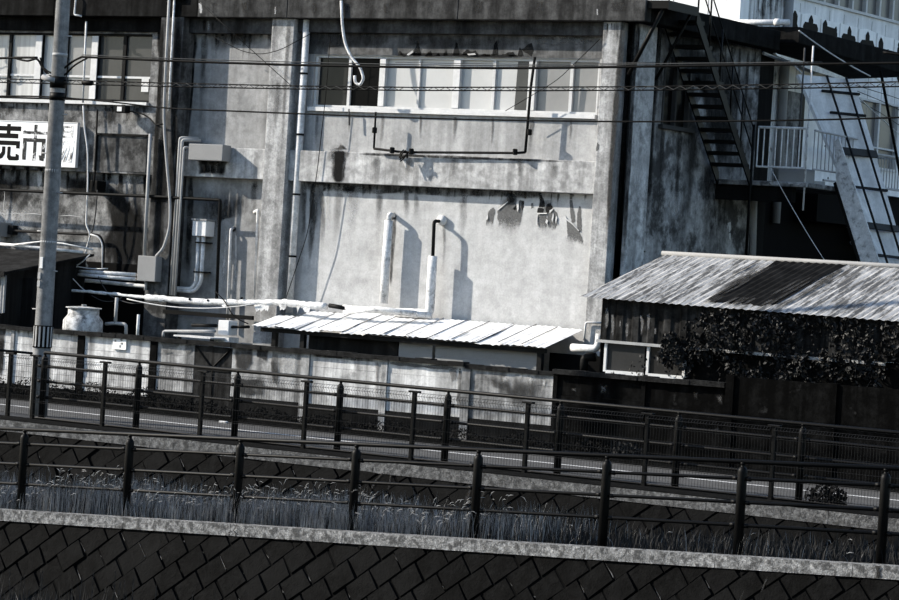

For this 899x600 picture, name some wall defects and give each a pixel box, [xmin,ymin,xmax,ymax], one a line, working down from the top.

leakage [189,2,276,124]
peeling [398,35,534,58]
leakage [66,26,181,265]
leakage [199,161,227,174]
leakage [0,169,45,225]
leakage [205,184,257,221]
leakage [302,145,559,247]
peeling [486,192,583,243]